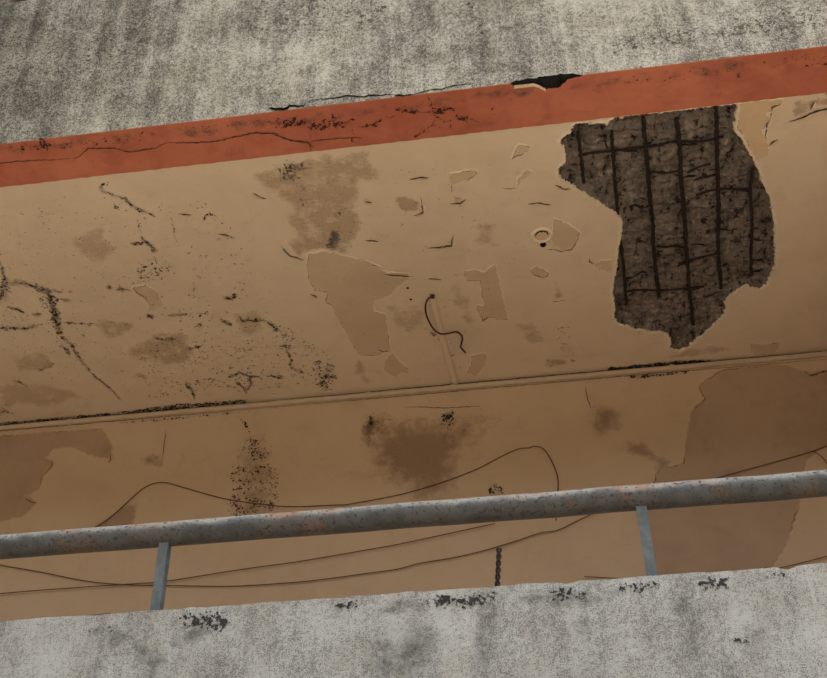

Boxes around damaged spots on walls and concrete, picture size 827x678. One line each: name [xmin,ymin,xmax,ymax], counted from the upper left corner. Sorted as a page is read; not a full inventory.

crack [100,182,190,292]
crack [0,83,478,164]
leakage [275,160,307,189]
leakage [324,209,341,250]
spalling [554,98,786,353]
peeling [791,93,827,122]
peeling [280,246,412,378]
crack [0,267,824,431]
peeling [0,428,114,522]
leakage [0,316,338,516]
peeling [653,364,827,483]
peeling [647,499,801,576]